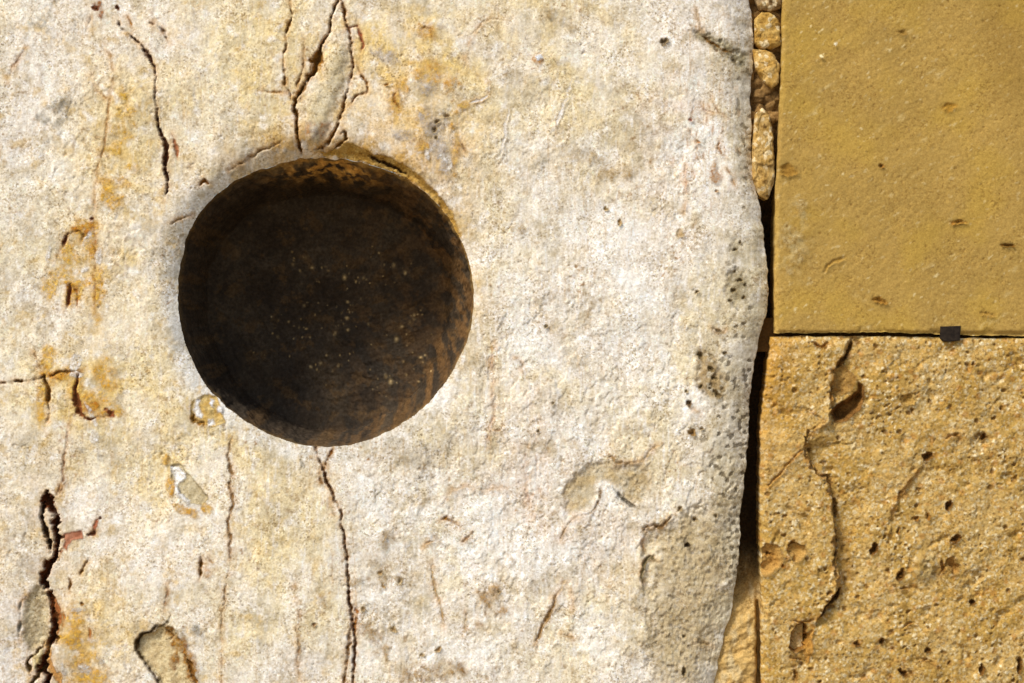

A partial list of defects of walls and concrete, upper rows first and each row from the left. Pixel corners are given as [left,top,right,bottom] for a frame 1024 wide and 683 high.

crack [119,20,179,194]
crack [239,0,368,164]
crack [15,355,114,683]
spalling [162,454,212,517]
crack [300,447,359,683]
crack [768,450,828,487]
crack [820,509,849,617]
spalling [135,621,198,683]